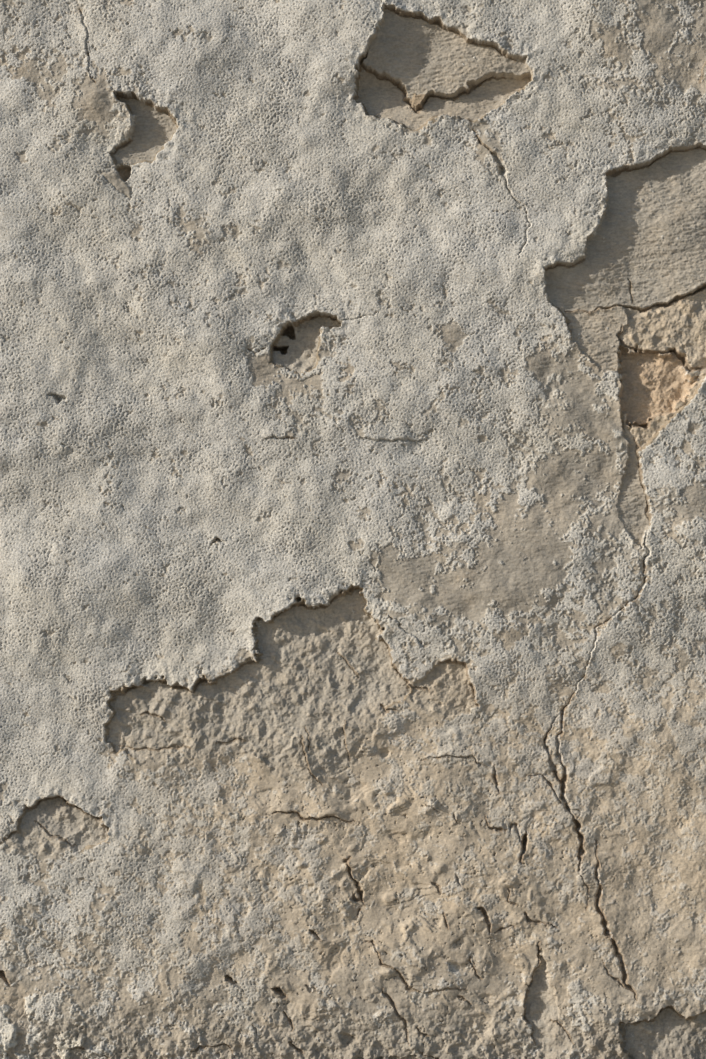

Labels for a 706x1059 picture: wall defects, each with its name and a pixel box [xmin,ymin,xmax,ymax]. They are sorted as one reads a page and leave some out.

spalling [353,5,533,132]
spalling [69,69,179,201]
crack [472,129,532,255]
spalling [244,311,378,396]
spalling [525,143,706,453]
spalling [105,440,618,785]
spalling [0,795,110,856]
crack [267,727,356,824]
crack [420,748,528,866]
crack [526,428,653,1001]
crack [344,856,483,1059]
crack [431,873,558,936]